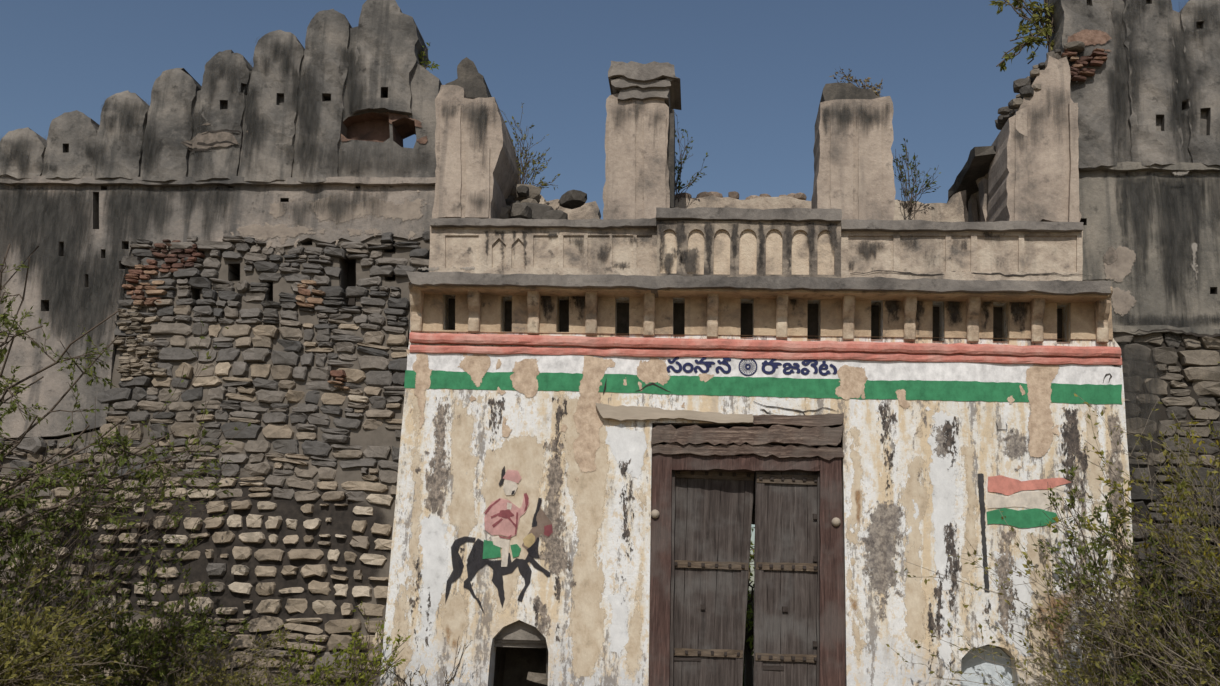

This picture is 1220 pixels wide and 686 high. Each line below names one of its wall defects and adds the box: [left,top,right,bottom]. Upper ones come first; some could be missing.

damp [3,139,57,173]
damp [192,41,315,167]
damp [343,49,363,116]
damp [0,188,229,360]
peeling [623,357,670,391]
damp [659,221,713,275]
damp [784,223,838,267]
damp [1118,314,1219,328]
damp [1121,171,1220,299]
peeling [373,349,648,686]
peeling [835,365,1053,686]
peeling [1001,364,1125,594]